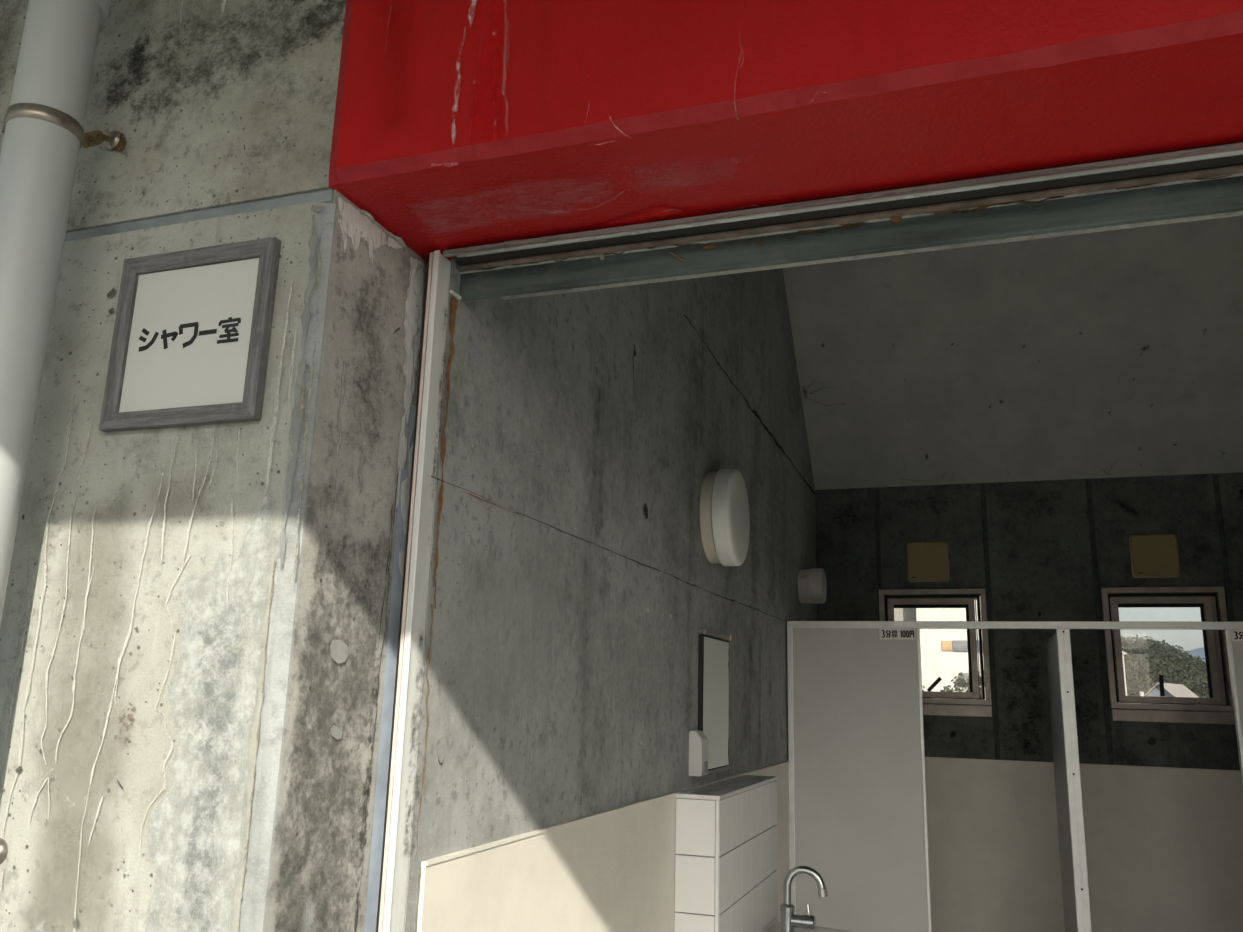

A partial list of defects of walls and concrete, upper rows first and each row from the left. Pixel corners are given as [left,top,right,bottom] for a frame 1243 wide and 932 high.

leakage [104,0,346,119]
leakage [0,399,178,932]
leakage [183,440,219,565]
leakage [276,536,381,932]
rust [417,297,458,847]
crack [684,315,815,495]